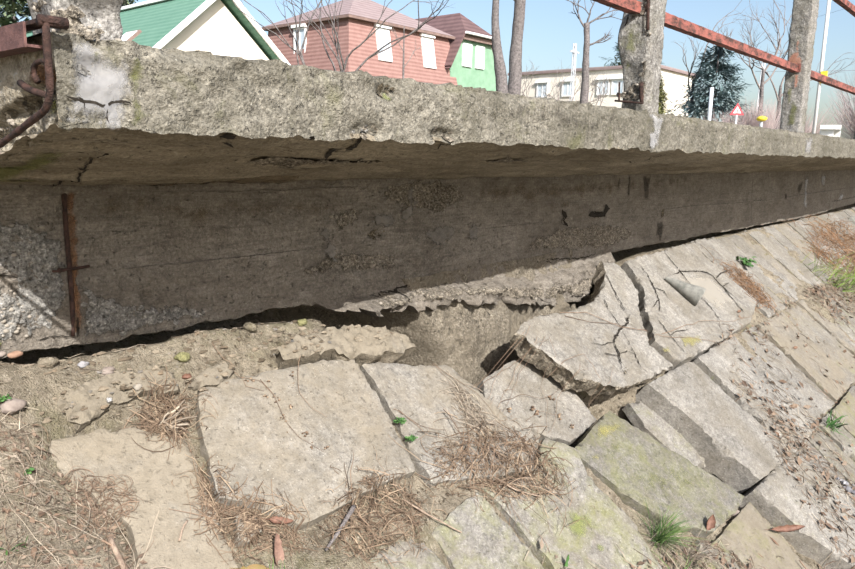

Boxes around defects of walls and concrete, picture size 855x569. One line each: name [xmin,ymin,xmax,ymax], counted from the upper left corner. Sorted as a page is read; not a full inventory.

corrosion [30,64,57,82]
crack [219,134,236,148]
crack [53,152,135,186]
spalling [0,193,205,340]
crack [537,252,600,263]
crack [370,284,410,302]
crack [643,254,746,354]
crack [36,317,80,341]
crack [571,275,642,370]